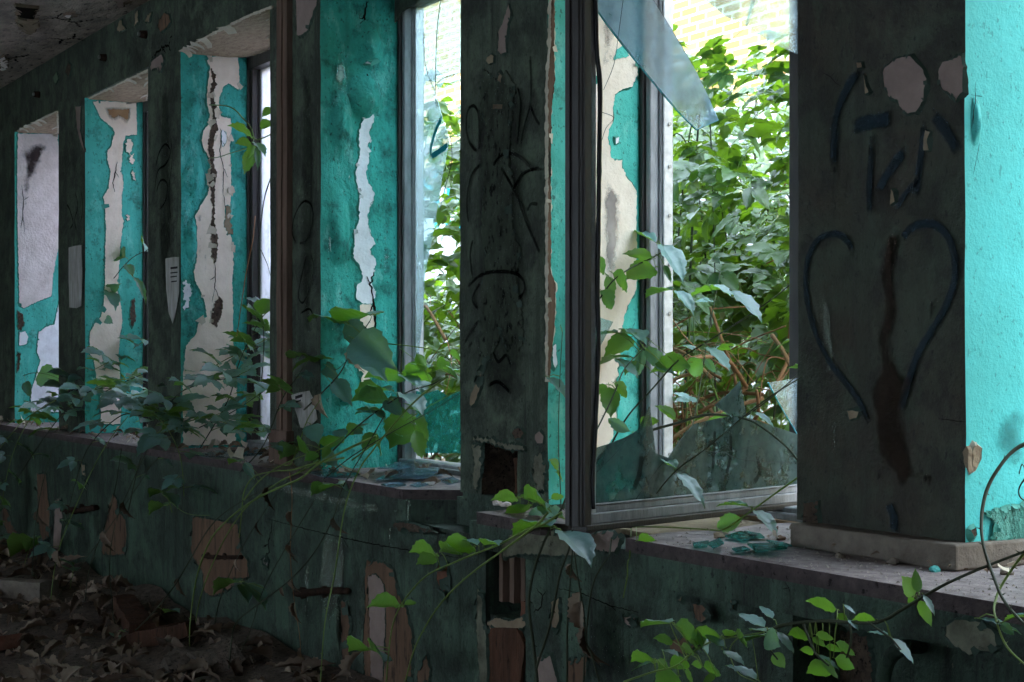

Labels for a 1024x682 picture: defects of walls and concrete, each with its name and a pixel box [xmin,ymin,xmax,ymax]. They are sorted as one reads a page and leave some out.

peeling [856,52,969,116]
leakage [25,146,45,191]
peeling [15,111,59,414]
peeling [75,53,166,426]
peeling [179,6,274,447]
peeling [350,114,376,328]
peeling [596,0,640,447]
peeling [190,514,251,597]
peeling [471,429,549,494]
peeling [966,501,1024,542]
peeling [362,557,432,682]